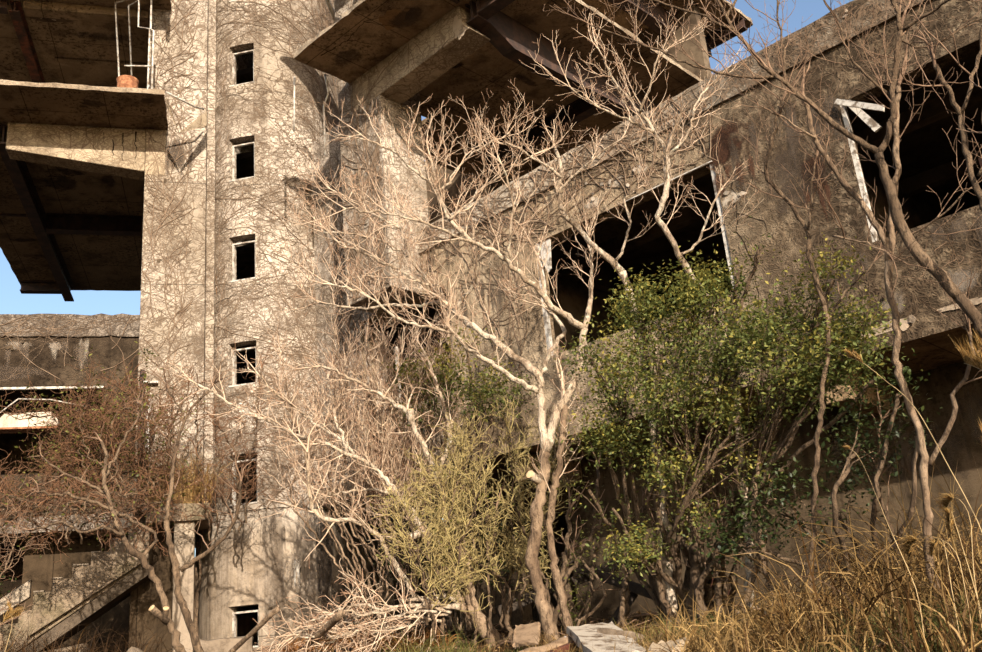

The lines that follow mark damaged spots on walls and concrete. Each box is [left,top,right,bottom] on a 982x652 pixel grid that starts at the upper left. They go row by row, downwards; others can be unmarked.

corrosion [707,123,755,194]